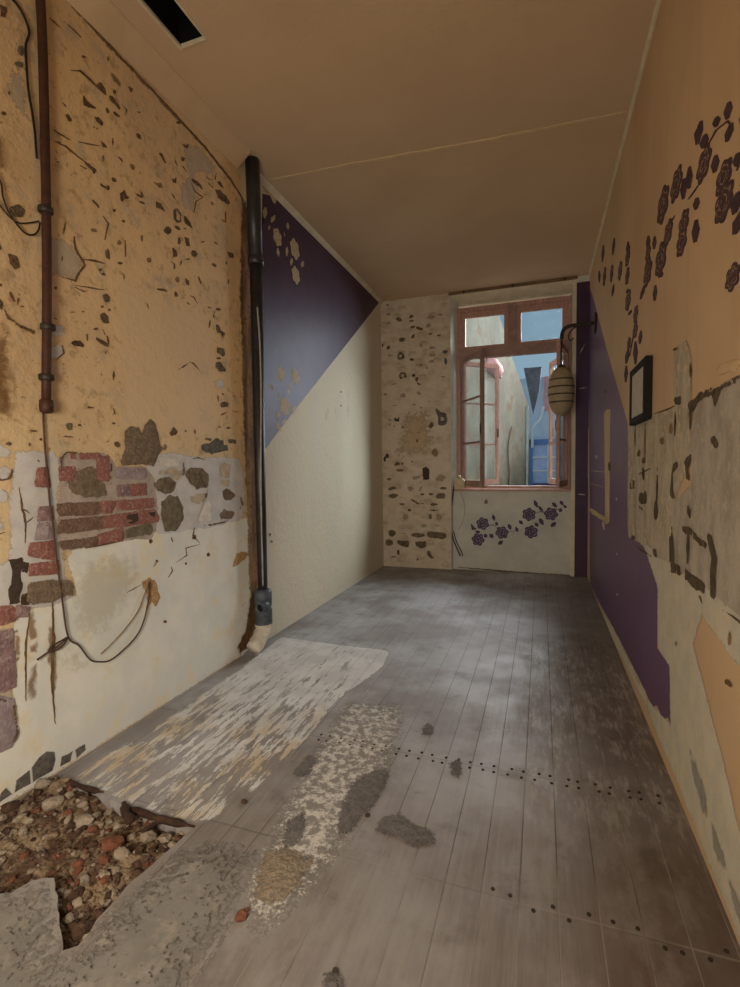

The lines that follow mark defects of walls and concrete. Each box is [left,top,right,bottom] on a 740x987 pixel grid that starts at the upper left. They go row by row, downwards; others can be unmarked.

spalling [83,73,140,129]
damp [0,340,10,413]
spalling [382,304,448,428]
spalling [384,454,413,498]
flaking render [408,475,447,499]
spalling [233,552,248,567]
flaking render [385,514,446,561]
peeling [588,341,740,939]
peeling [78,637,389,821]